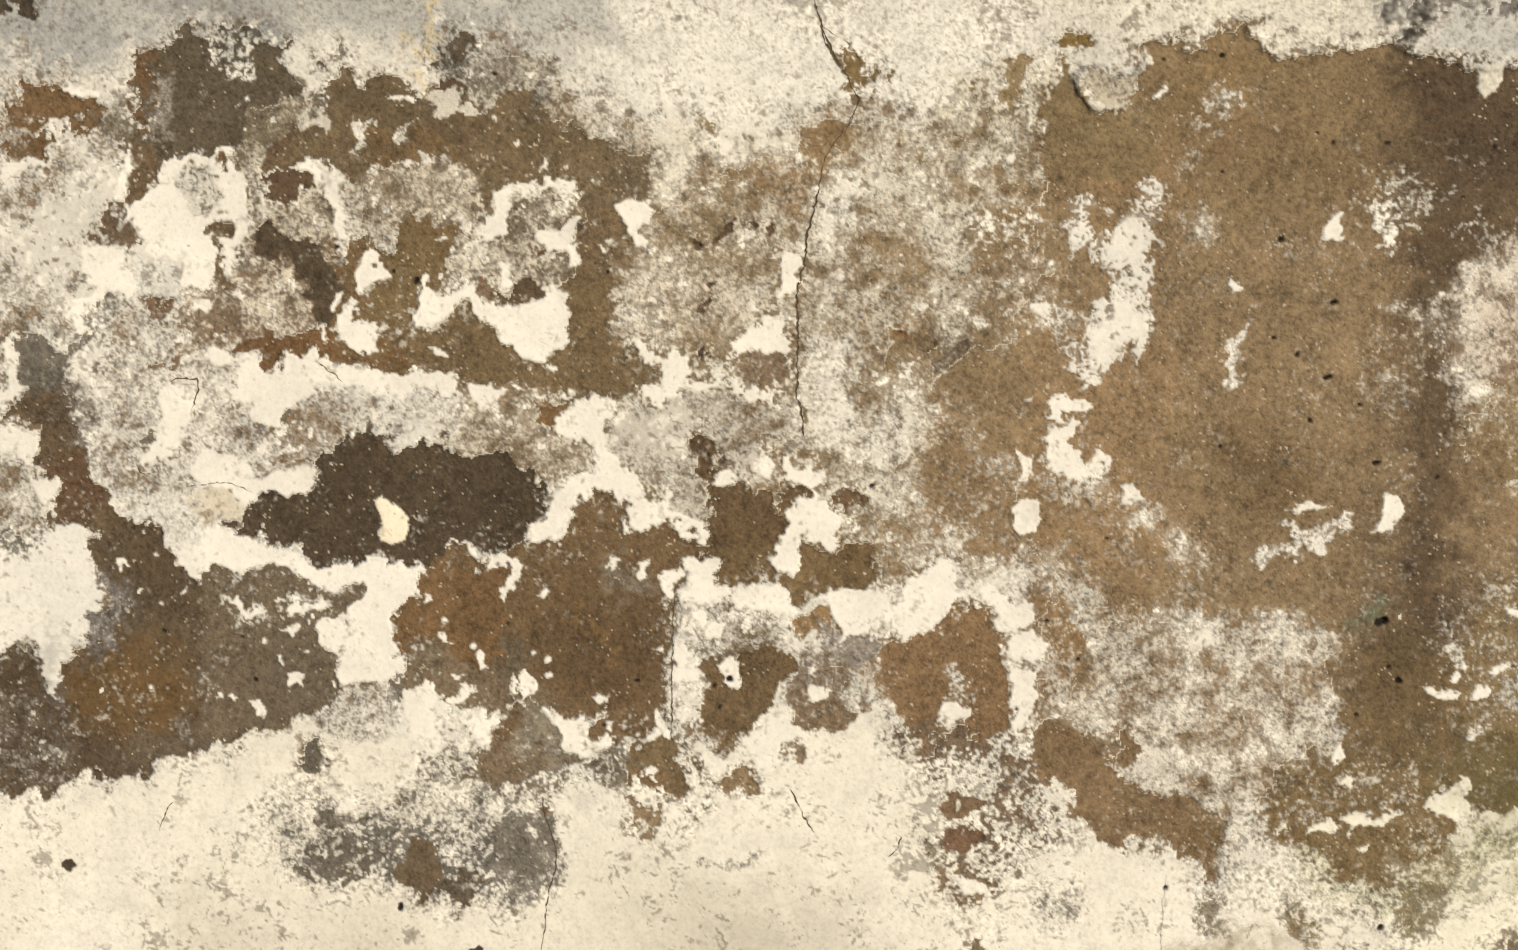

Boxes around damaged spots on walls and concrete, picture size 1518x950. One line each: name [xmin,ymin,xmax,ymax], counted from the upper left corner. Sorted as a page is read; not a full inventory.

spalling [61,859,78,873]
spalling [0,291,367,802]
spalling [0,19,1036,589]
spalling [221,421,879,911]
crack [795,0,860,436]
spalling [869,18,1518,941]